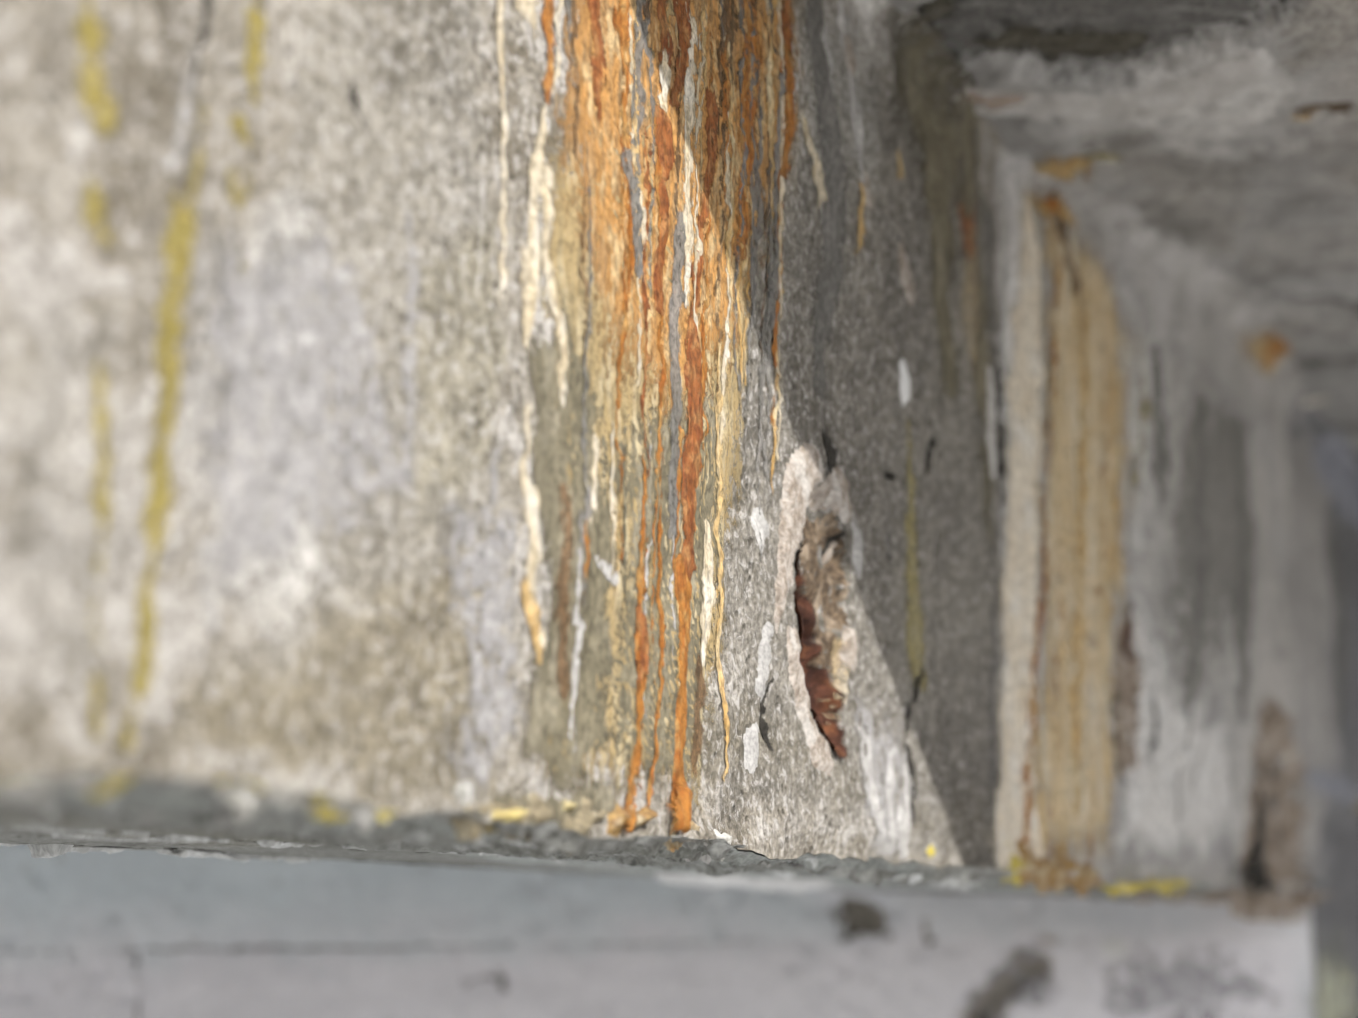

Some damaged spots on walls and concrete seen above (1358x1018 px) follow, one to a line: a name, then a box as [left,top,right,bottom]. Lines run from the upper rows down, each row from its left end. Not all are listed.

damp [805,0,873,398]
rust [517,0,828,862]
spalling [750,428,864,777]
damp [896,0,1299,899]
rust [1002,839,1103,897]